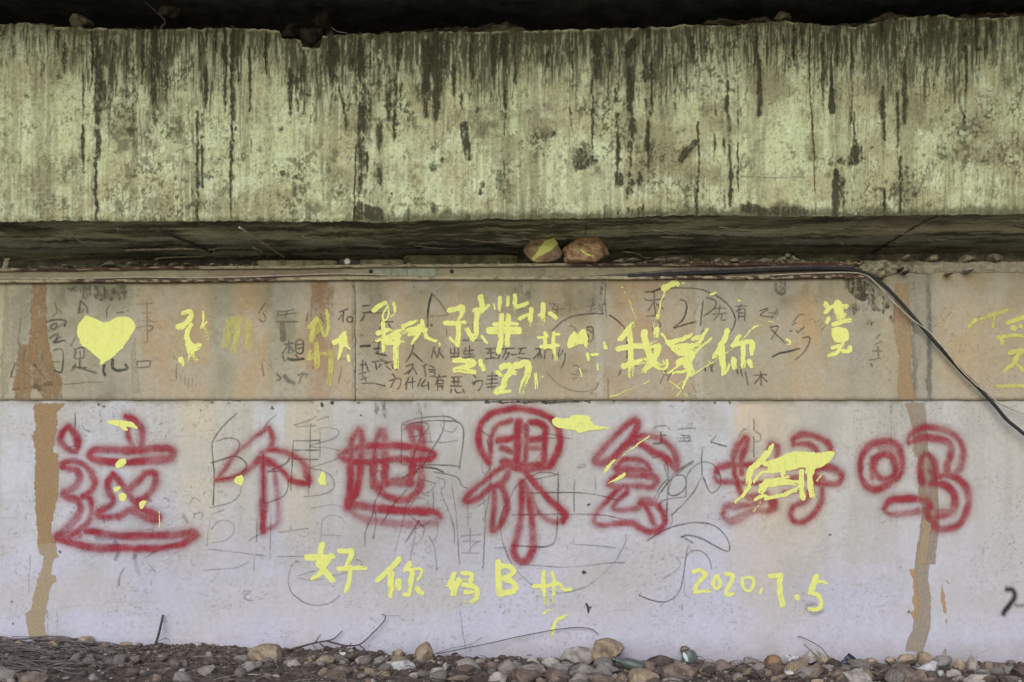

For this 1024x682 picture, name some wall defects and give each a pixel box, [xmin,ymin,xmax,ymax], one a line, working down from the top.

water stain [80,31,112,223]
water stain [126,27,168,121]
water stain [195,26,273,222]
water stain [287,65,311,116]
water stain [321,32,409,220]
water stain [422,29,471,161]
water stain [491,32,517,135]
water stain [567,26,655,215]
water stain [678,80,808,216]
water stain [754,27,768,117]
water stain [821,29,917,217]
water stain [962,18,993,123]